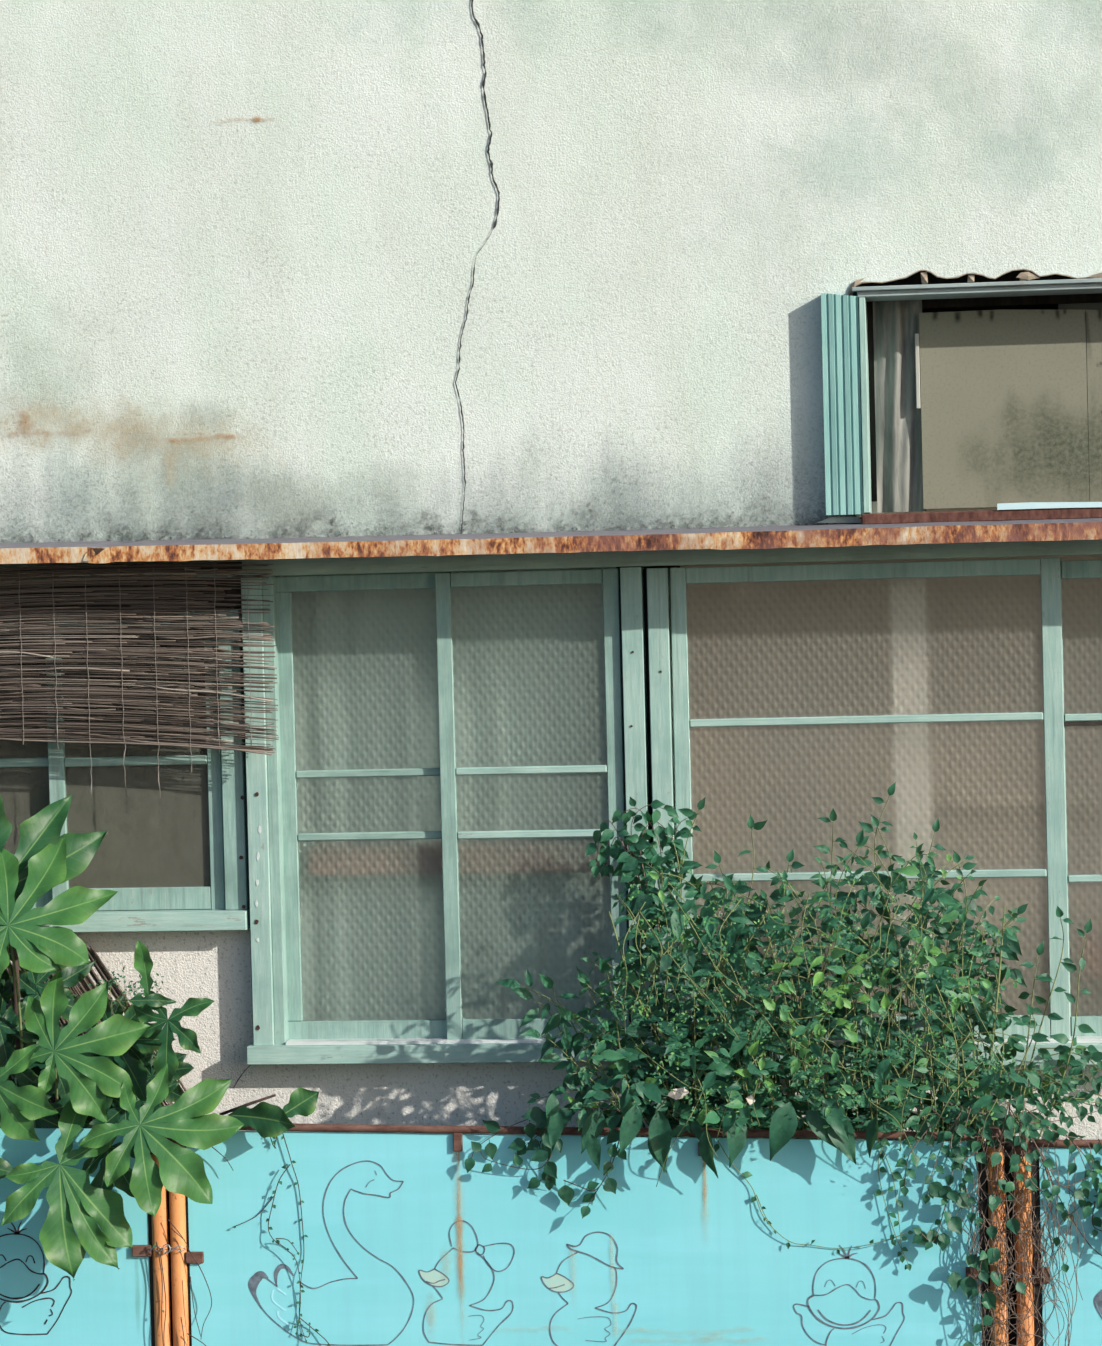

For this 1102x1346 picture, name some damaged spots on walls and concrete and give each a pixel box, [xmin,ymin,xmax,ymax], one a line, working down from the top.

crack [455,0,500,534]
leakage [107,505,231,542]
leakage [425,515,532,535]